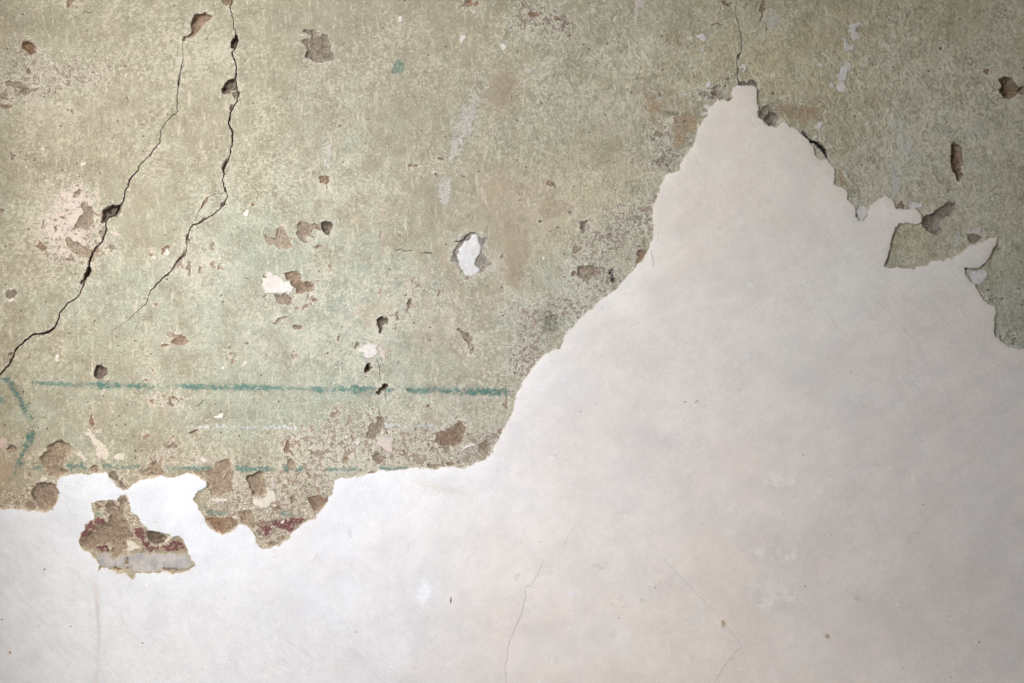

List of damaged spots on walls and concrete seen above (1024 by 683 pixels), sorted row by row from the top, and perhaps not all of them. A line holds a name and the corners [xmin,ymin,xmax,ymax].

spalling [301,28,336,63]
crack [111,0,240,331]
peeling [35,180,126,263]
crack [0,43,184,375]
peeling [263,220,333,250]
peeling [450,231,504,280]
peeling [261,263,332,330]
spalling [2,439,73,512]
peeling [84,464,168,572]
peeling [188,429,267,497]
peeling [206,437,329,547]
peeling [426,420,467,469]